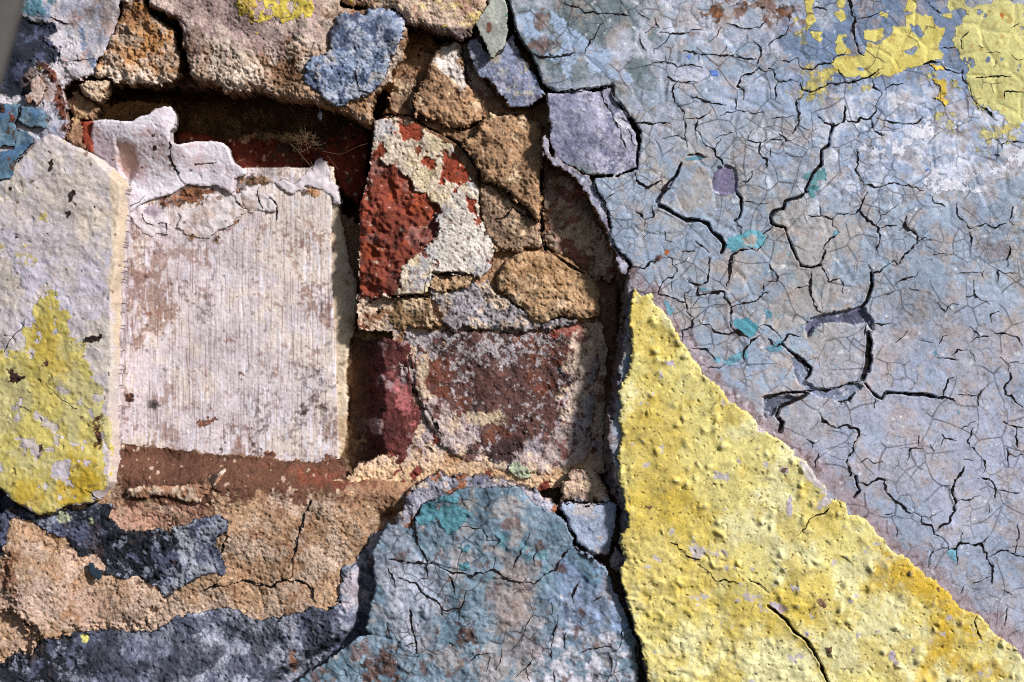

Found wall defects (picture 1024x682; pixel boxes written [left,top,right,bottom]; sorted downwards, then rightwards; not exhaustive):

peeling [0,103,50,179]
peeling [130,187,278,238]
crack [496,0,1024,624]
spalling [348,337,421,470]
spalling [508,461,531,479]
peeling [0,529,383,682]
crack [204,500,315,603]
crack [387,499,630,682]
crack [671,542,827,682]